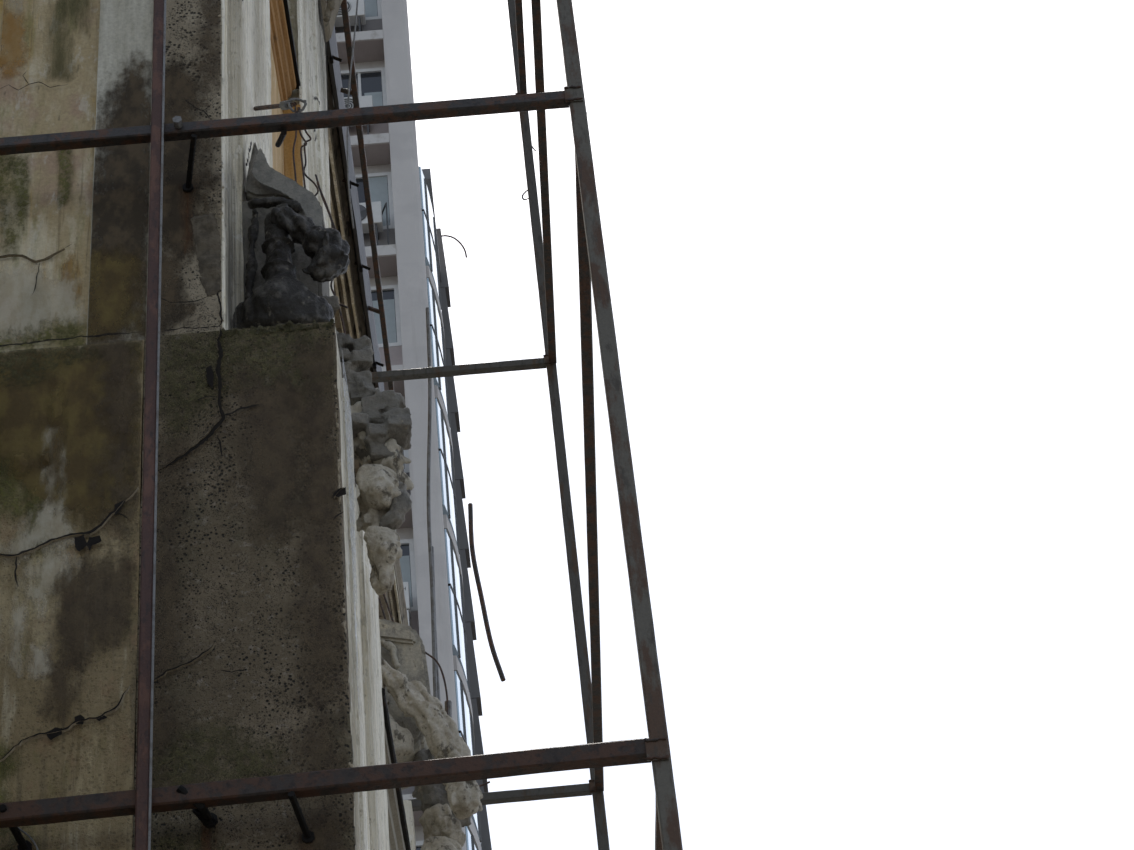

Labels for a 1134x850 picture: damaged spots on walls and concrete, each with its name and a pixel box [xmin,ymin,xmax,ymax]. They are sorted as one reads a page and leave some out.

crack [0,245,70,293]
water stain [0,251,144,718]
crack [0,292,259,585]
spalling [323,295,412,715]
crack [0,643,246,762]